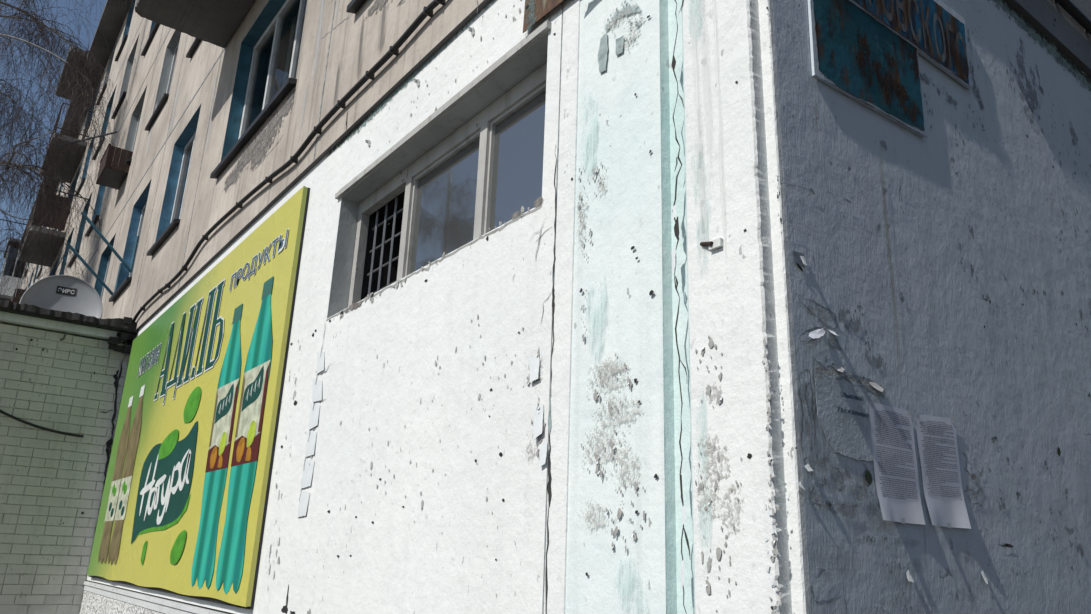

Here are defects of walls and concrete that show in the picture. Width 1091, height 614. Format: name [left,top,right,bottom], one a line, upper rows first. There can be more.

peeling [598,0,650,73]
peeling [986,38,1091,201]
crack [95,343,126,531]
crack [531,146,557,612]
peeling [577,353,649,553]
crack [672,0,690,614]
peeling [695,336,722,407]
peeling [682,435,752,598]
spalling [764,451,782,614]
peeling [839,305,886,373]